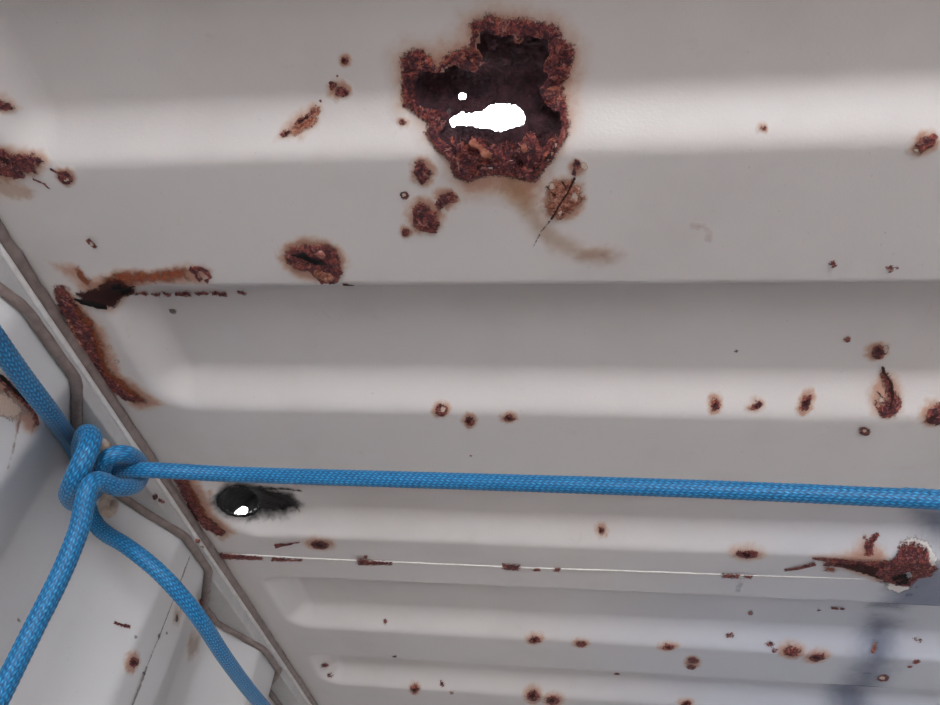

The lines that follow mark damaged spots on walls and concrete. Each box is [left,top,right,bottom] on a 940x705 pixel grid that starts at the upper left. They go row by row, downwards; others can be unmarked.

corrosion [0,140,58,189]
corrosion [272,51,356,145]
corrosion [378,0,597,239]
corrosion [904,124,940,161]
corrosion [272,232,355,285]
corrosion [43,258,217,412]
corrosion [704,389,725,416]
corrosion [793,384,819,418]
corrosion [861,339,940,429]
corrosion [171,479,341,562]
corrosion [784,529,938,587]
corrosion [766,635,835,665]